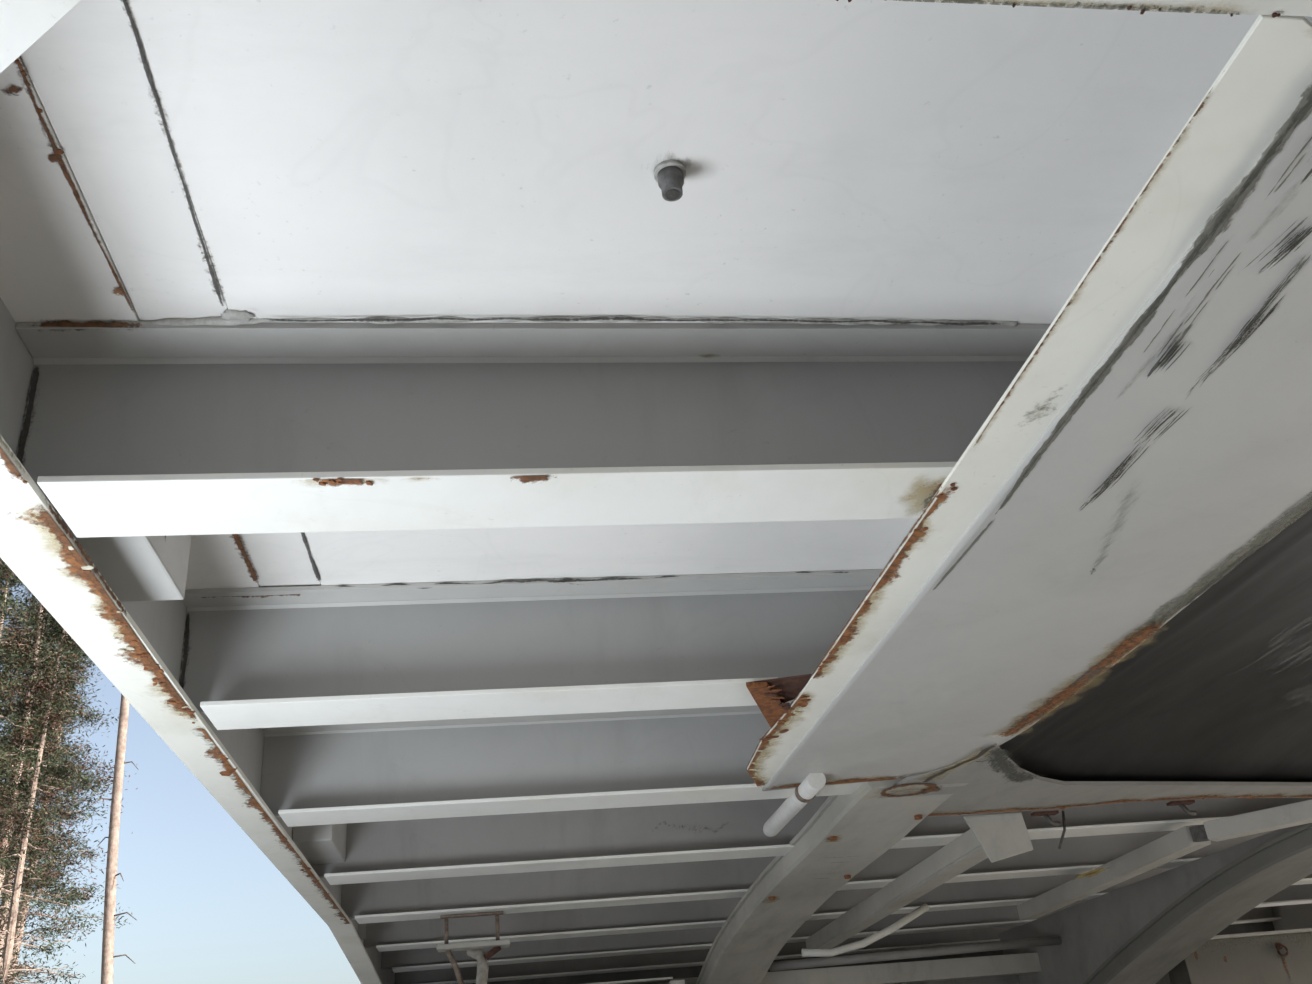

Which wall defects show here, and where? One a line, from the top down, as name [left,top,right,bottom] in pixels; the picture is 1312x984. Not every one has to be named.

rust [885,0,1240,17]
rust [41,321,140,331]
leakage [933,85,1312,590]
rust [313,478,373,486]
rust [811,483,958,679]
rust [19,499,350,924]
rust [746,694,811,789]
rust [1000,623,1163,737]